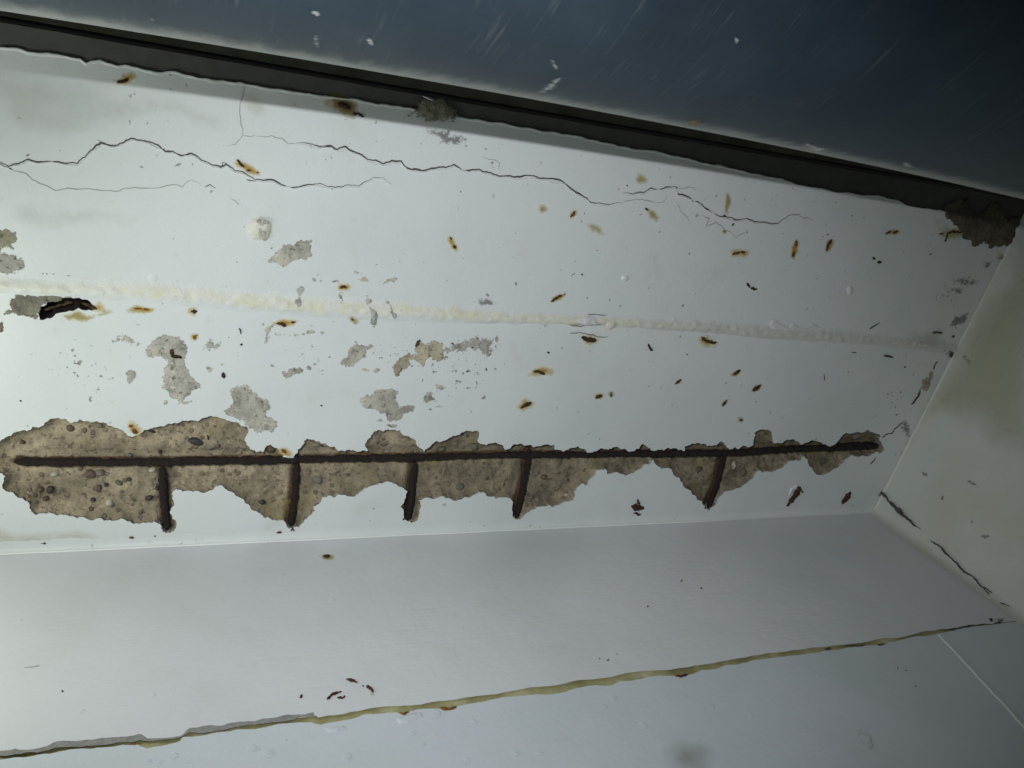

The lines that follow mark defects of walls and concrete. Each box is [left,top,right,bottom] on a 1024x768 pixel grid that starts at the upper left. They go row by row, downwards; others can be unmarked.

corrosion [236,159,259,174]
crack [0,87,812,238]
spalling [939,198,1020,249]
peeling [268,240,312,267]
peeling [0,294,97,332]
corrosion [65,304,108,321]
spalling [0,334,882,527]
corrosion [631,499,645,516]
corrosion [787,484,803,507]
crack [879,491,1009,630]
corrosion [327,678,374,700]